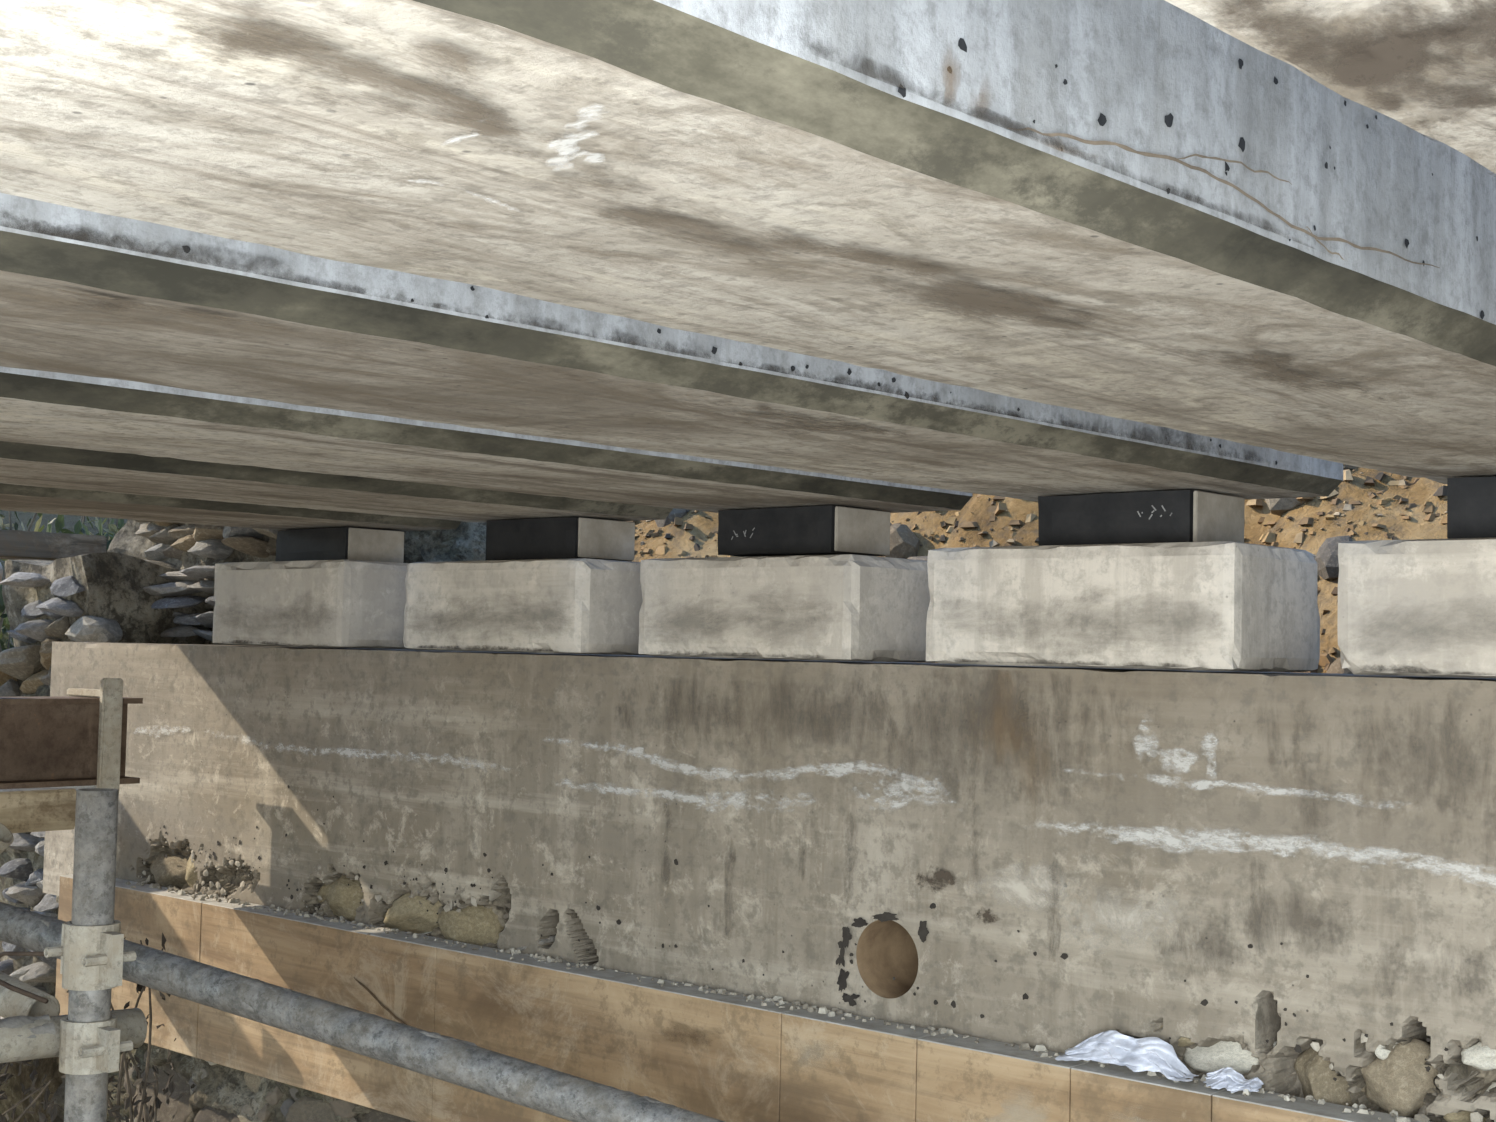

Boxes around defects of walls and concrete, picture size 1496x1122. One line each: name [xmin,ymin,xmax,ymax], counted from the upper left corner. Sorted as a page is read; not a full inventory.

damp [191,9,550,157]
crack [1023,127,1440,268]
damp [552,180,1095,340]
damp [564,743,883,811]
damp [1135,727,1317,796]
spalling [138,825,260,898]
spalling [288,853,511,949]
damp [1060,825,1332,857]
damp [1414,858,1496,885]
spalling [517,913,599,964]
spalling [1178,1037,1260,1075]
spalling [1294,1022,1496,1122]